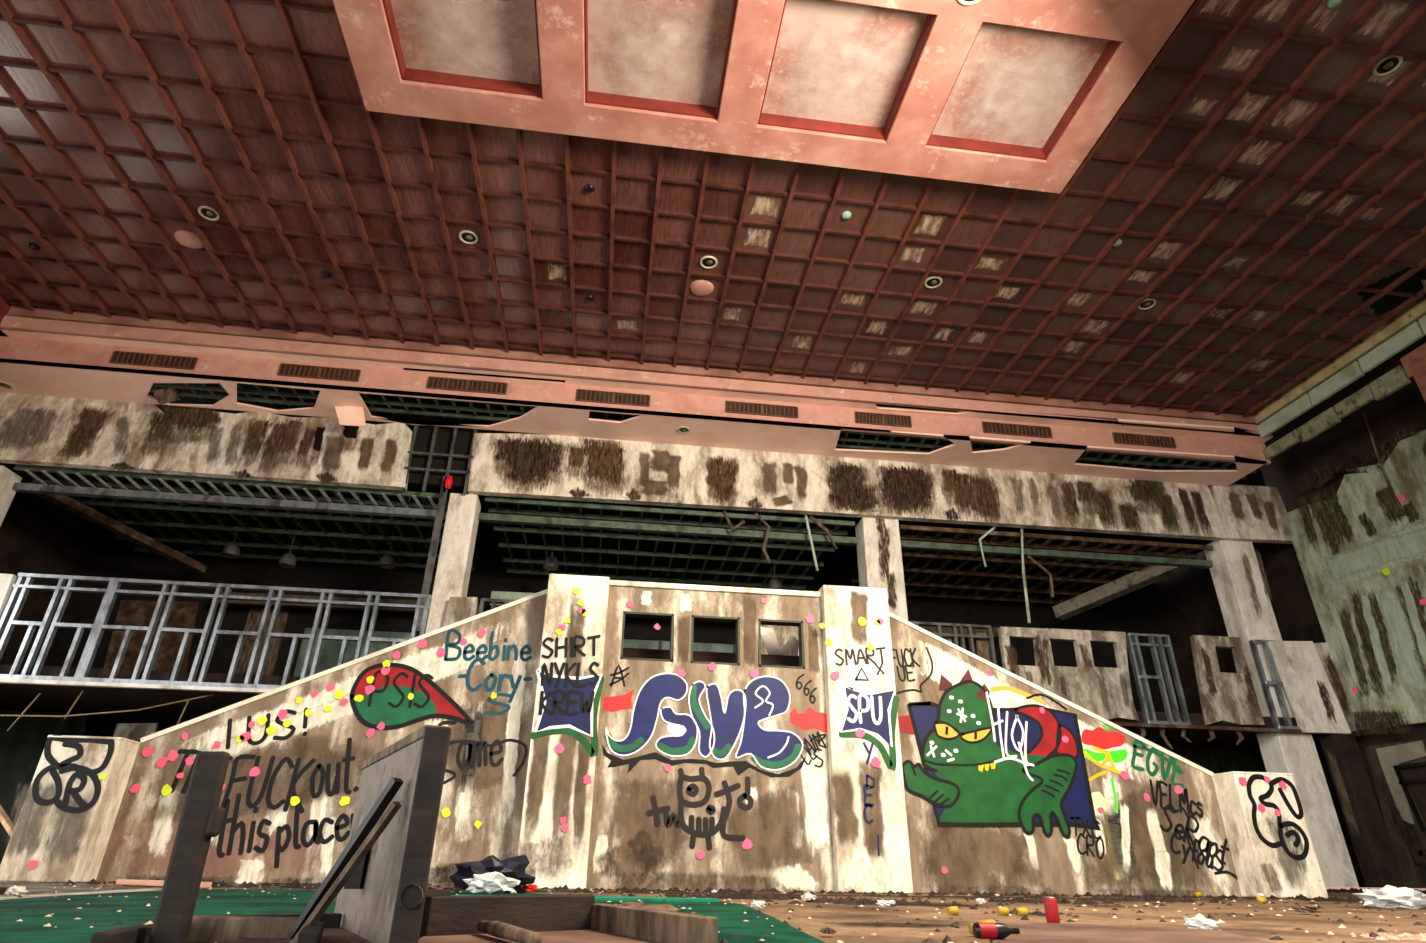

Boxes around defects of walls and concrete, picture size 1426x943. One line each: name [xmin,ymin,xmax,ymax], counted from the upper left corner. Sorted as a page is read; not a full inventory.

damp [313,425,397,471]
damp [492,436,565,490]
damp [639,450,681,495]
damp [762,463,807,506]
damp [826,462,933,515]
damp [1295,485,1419,556]
damp [564,604,587,677]
damp [851,592,868,643]
damp [1328,566,1426,699]
damp [184,672,361,762]
damp [390,625,769,889]
damp [787,752,884,856]